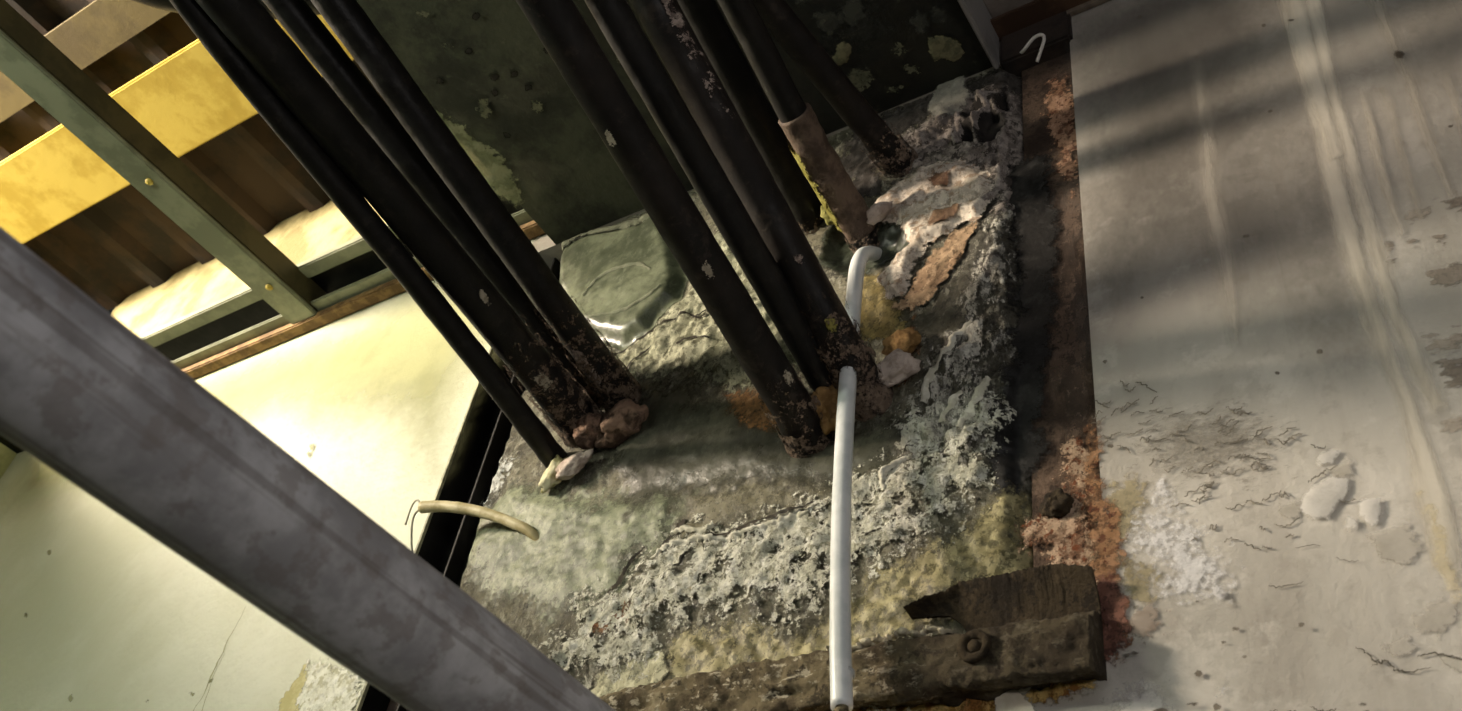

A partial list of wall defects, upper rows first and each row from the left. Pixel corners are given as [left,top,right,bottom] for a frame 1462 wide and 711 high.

flaking render [875,84,1024,313]
water stain [535,480,833,689]
water stain [851,204,1034,646]
corrosion [1015,75,1161,666]
water stain [1106,479,1236,605]
peeling [1091,380,1381,550]
corrosion [852,700,996,711]
corrosion [1023,680,1096,704]